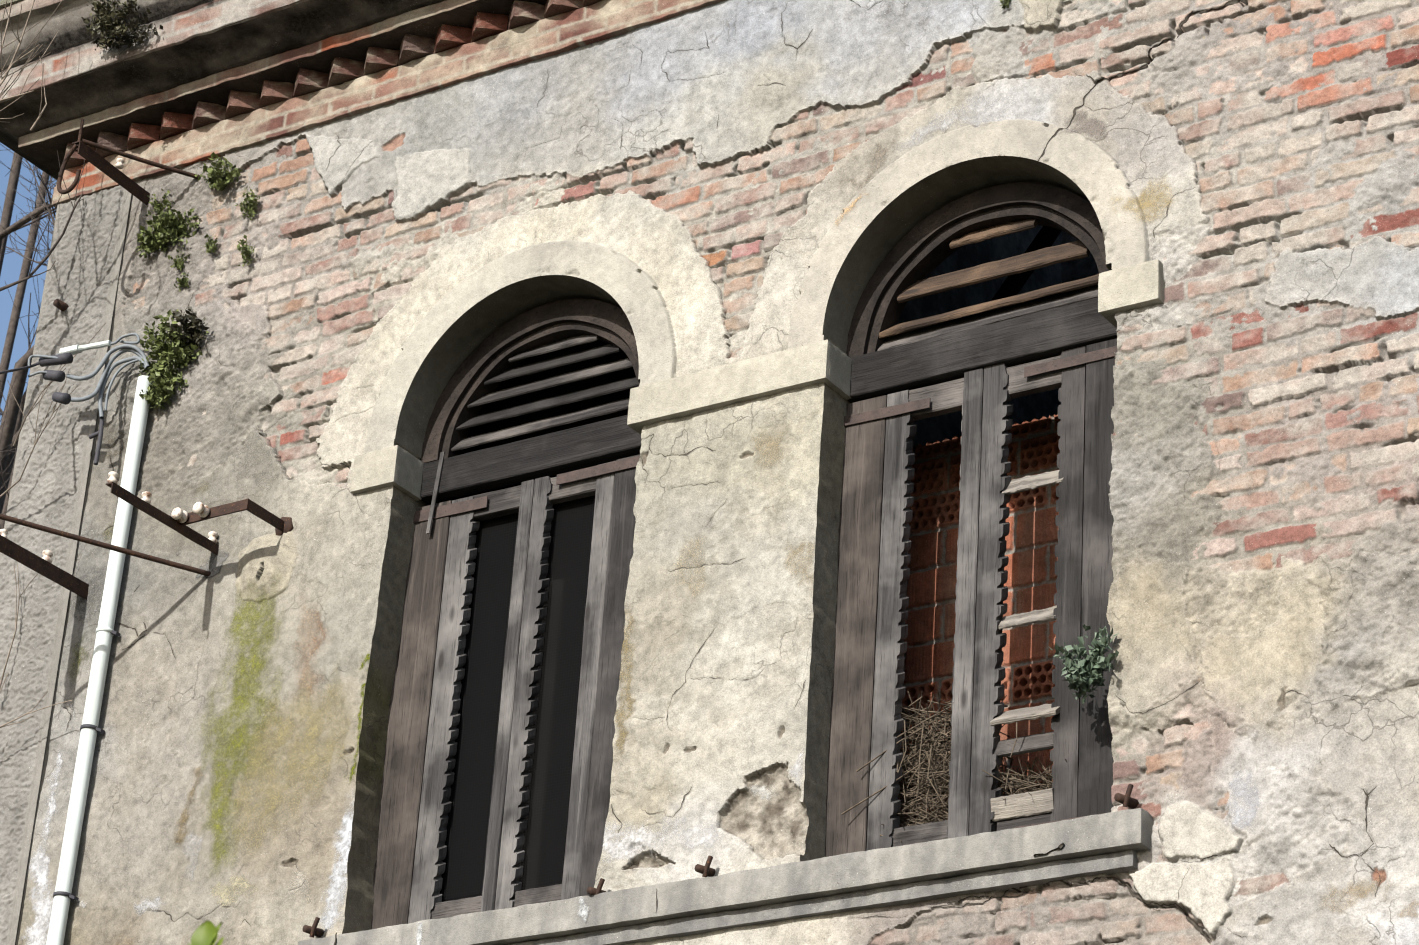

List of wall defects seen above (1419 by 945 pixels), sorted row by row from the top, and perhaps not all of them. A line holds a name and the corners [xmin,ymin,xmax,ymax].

crack [1037,0,1248,164]
flaking render [215,0,1419,562]
crack [641,434,725,523]
crack [635,630,764,731]
flaking render [1277,684,1289,712]
flaking render [622,845,676,870]
crack [611,787,692,832]
flaking render [719,761,809,860]
flaking render [867,718,1245,945]
flaking render [1255,913,1275,926]
flaking render [1371,865,1389,888]